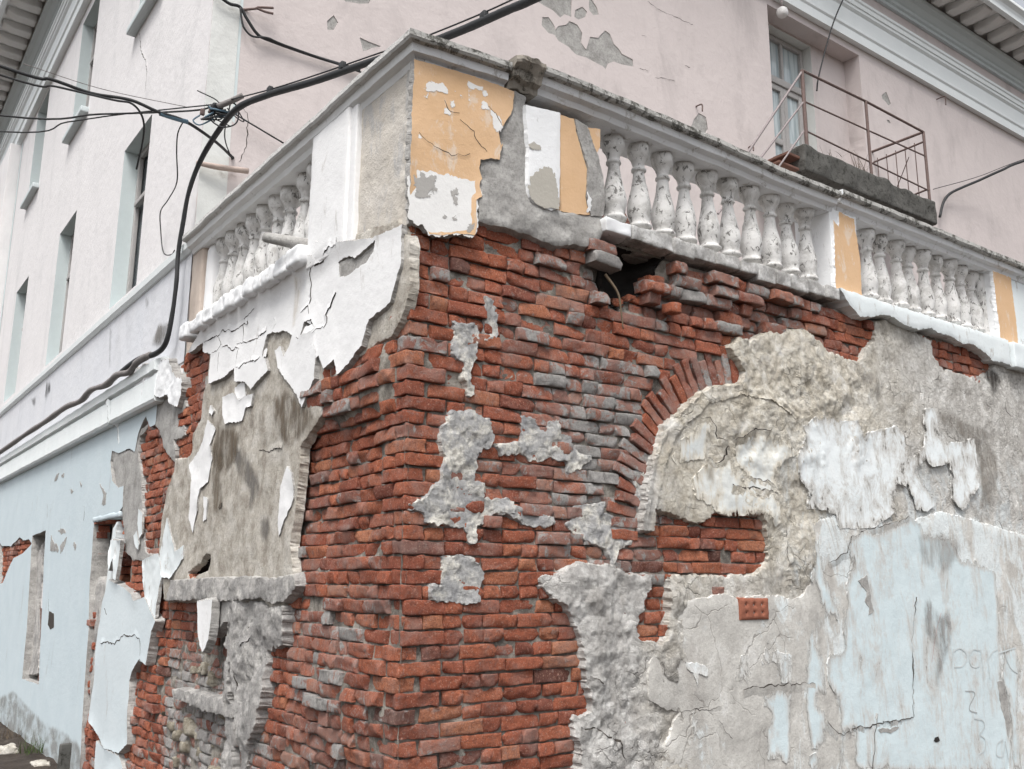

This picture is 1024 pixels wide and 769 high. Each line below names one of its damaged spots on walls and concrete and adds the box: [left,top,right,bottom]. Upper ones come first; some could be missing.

spalling [539,0,633,69]
crack [418,100,487,160]
peeling [424,81,503,132]
spalling [278,166,1022,769]
spalling [2,539,32,583]
spalling [82,347,273,769]
crack [744,682,816,698]
crack [825,597,917,769]
crack [681,706,733,740]